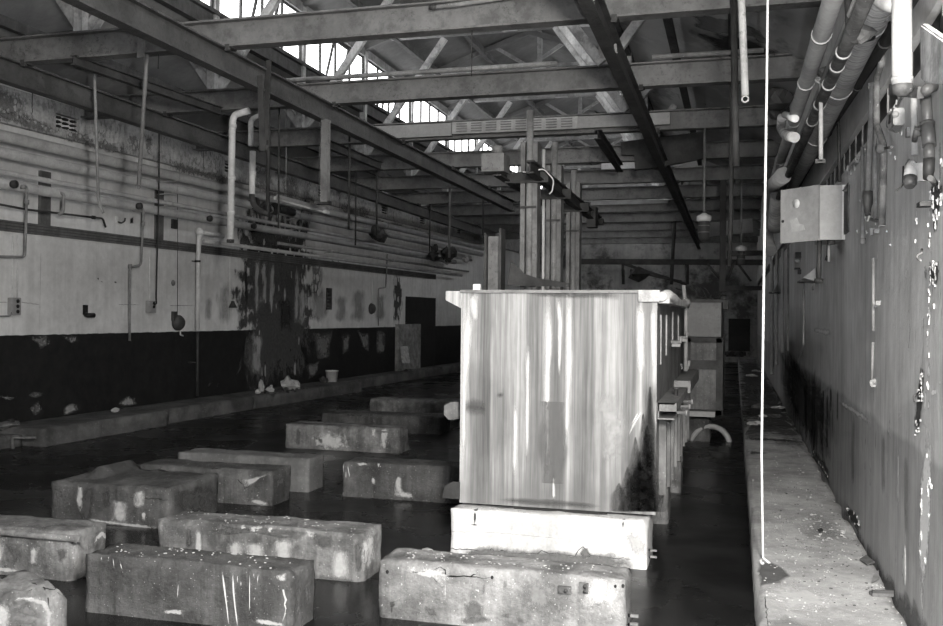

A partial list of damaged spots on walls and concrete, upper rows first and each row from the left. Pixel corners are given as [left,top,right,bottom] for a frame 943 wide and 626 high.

peeling [915,144,943,248]
leakage [740,352,871,457]
peeling [914,260,939,612]